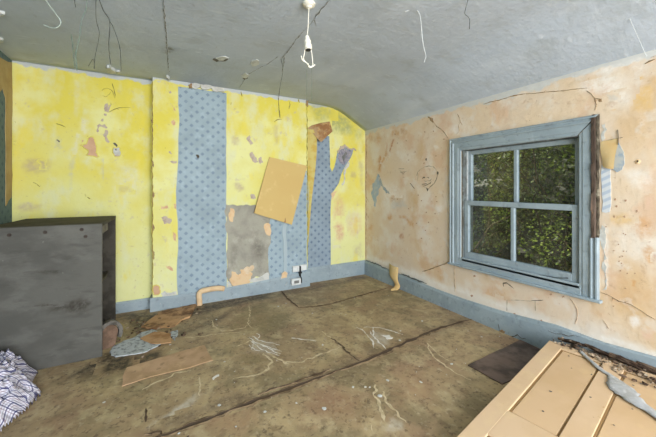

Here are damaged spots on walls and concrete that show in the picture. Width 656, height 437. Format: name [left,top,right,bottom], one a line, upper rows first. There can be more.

crack [231,0,329,103]
peeling [80,84,131,158]
crack [485,88,602,110]
flaking render [224,180,271,287]
peeling [371,174,411,218]
peeling [599,214,636,290]
crack [281,288,387,308]
crack [144,313,481,437]